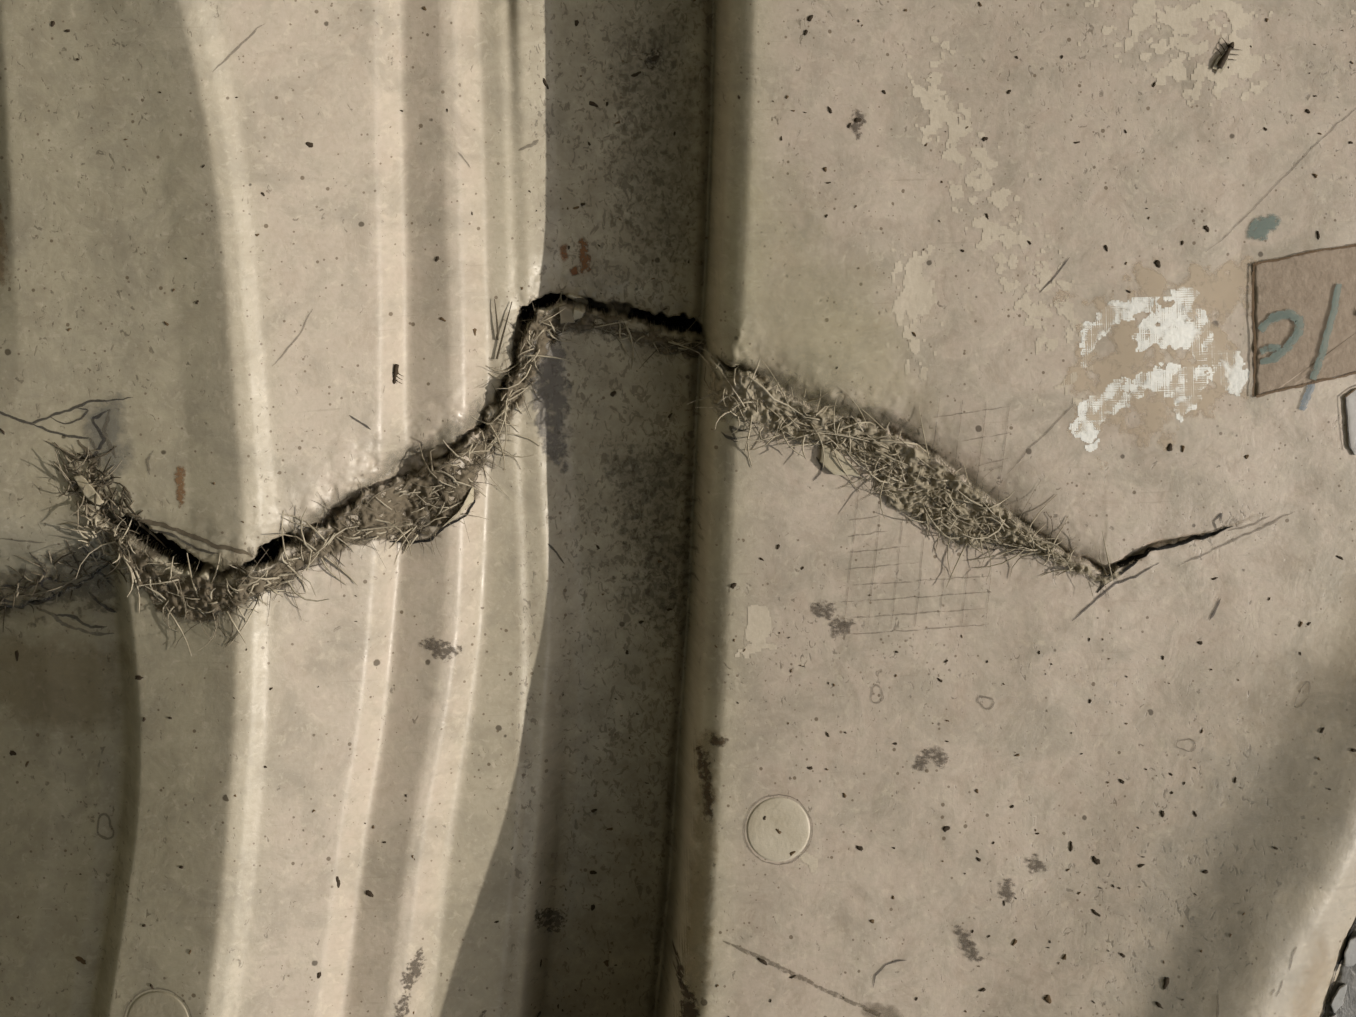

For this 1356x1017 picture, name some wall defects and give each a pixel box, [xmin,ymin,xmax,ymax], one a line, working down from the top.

peeling [1102,0,1273,106]
peeling [907,36,1256,452]
peeling [886,245,944,380]
crack [0,277,1233,656]
peeling [1329,984,1347,1017]
peeling [1343,936,1356,967]